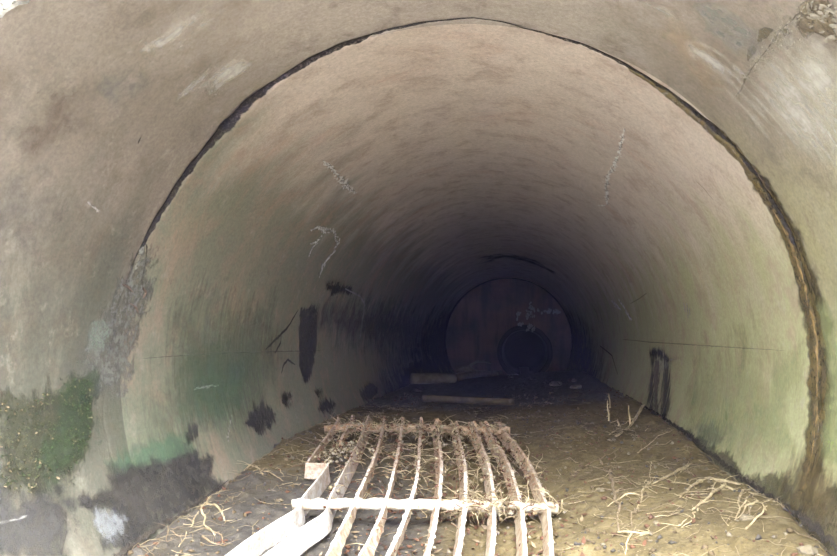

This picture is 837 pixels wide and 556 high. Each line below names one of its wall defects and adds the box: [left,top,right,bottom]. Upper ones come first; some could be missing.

crack [736,1,827,97]
spalling [795,0,837,43]
spalling [79,243,153,397]
leakage [0,424,229,556]